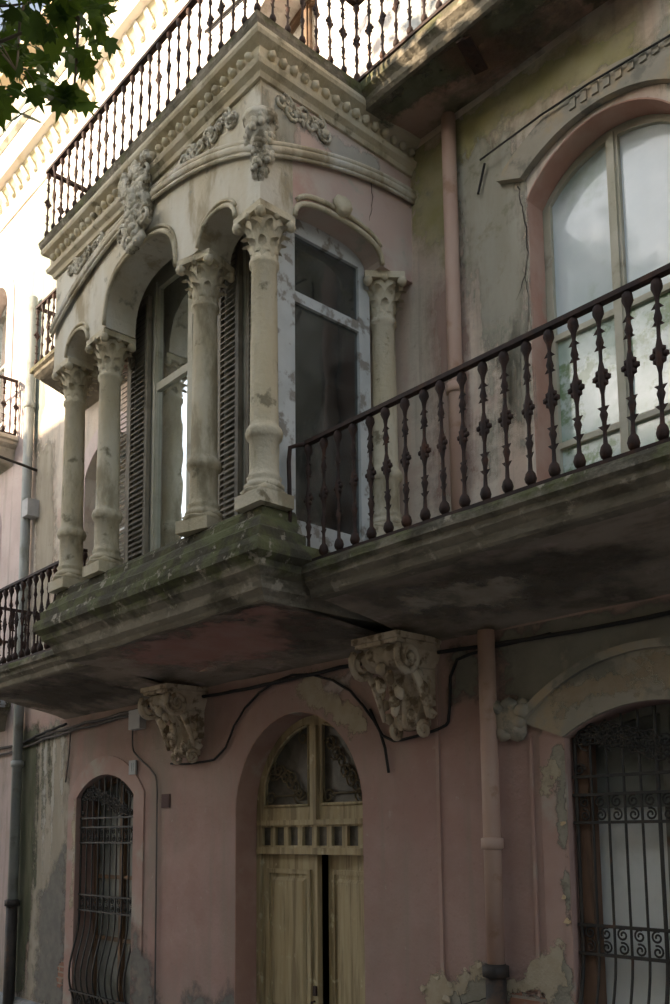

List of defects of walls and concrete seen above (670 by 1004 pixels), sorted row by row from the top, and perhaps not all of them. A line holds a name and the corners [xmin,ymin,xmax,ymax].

damp [370,0,556,128]
crack [516,186,529,321]
damp [396,576,532,614]
peeling [295,669,368,741]
damp [15,720,70,1004]
peeling [419,960,486,1004]
peeling [507,938,575,1004]